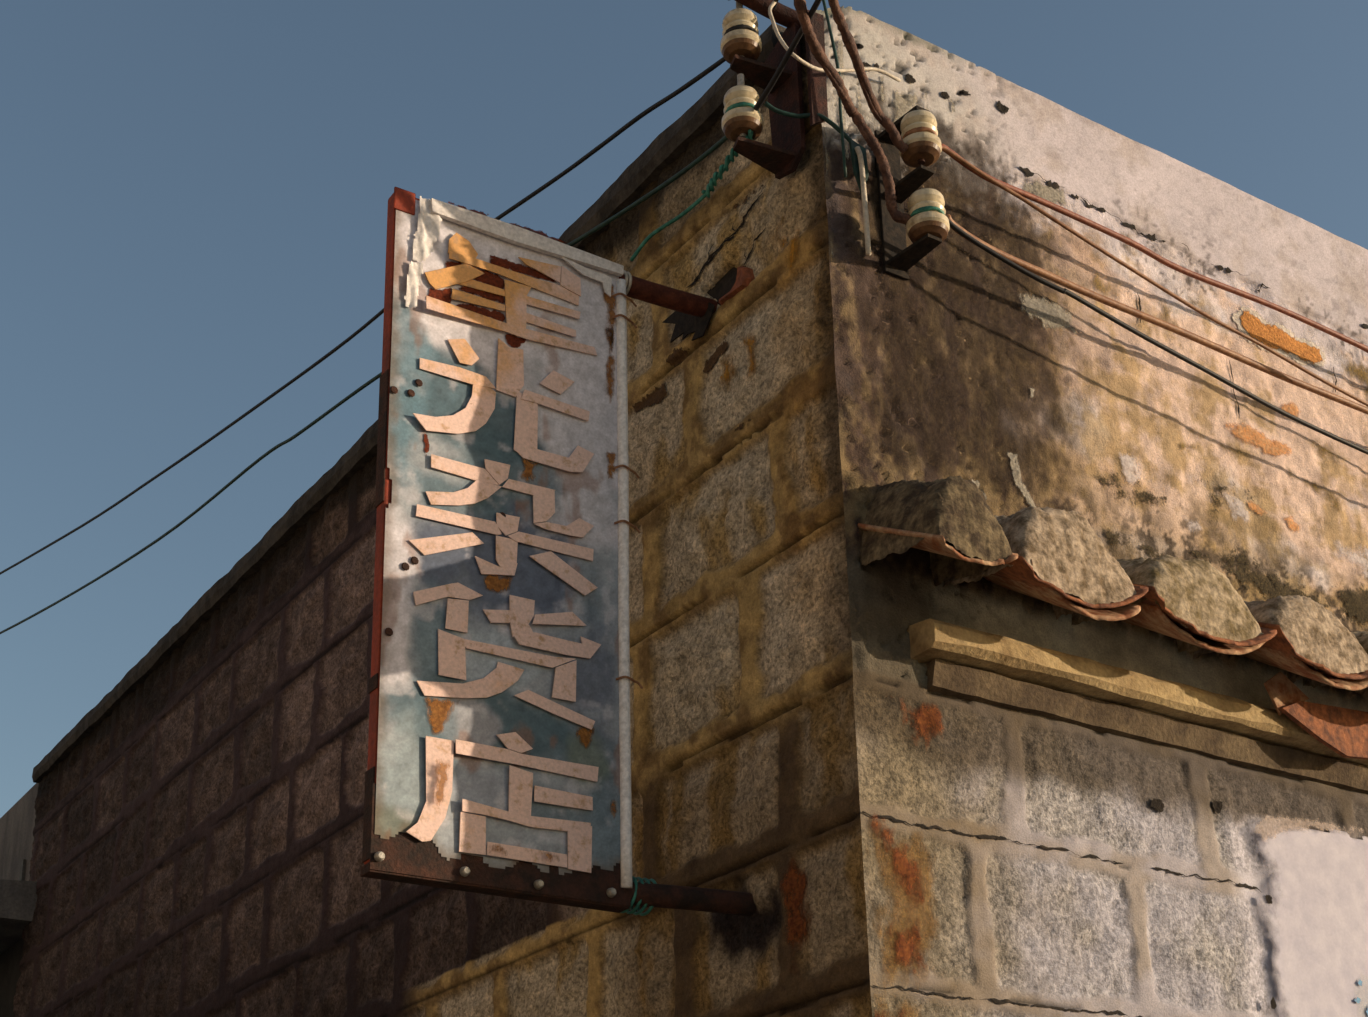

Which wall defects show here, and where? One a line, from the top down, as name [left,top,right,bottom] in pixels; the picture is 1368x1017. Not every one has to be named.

water stain [824,76,897,174]
crack [686,194,765,288]
water stain [865,93,1060,508]
peeling [1232,307,1326,367]
corrosion [872,815,925,903]
crack [862,811,1262,893]
corrosion [780,860,811,946]
corrosion [895,926,923,972]
crack [873,985,1142,1017]